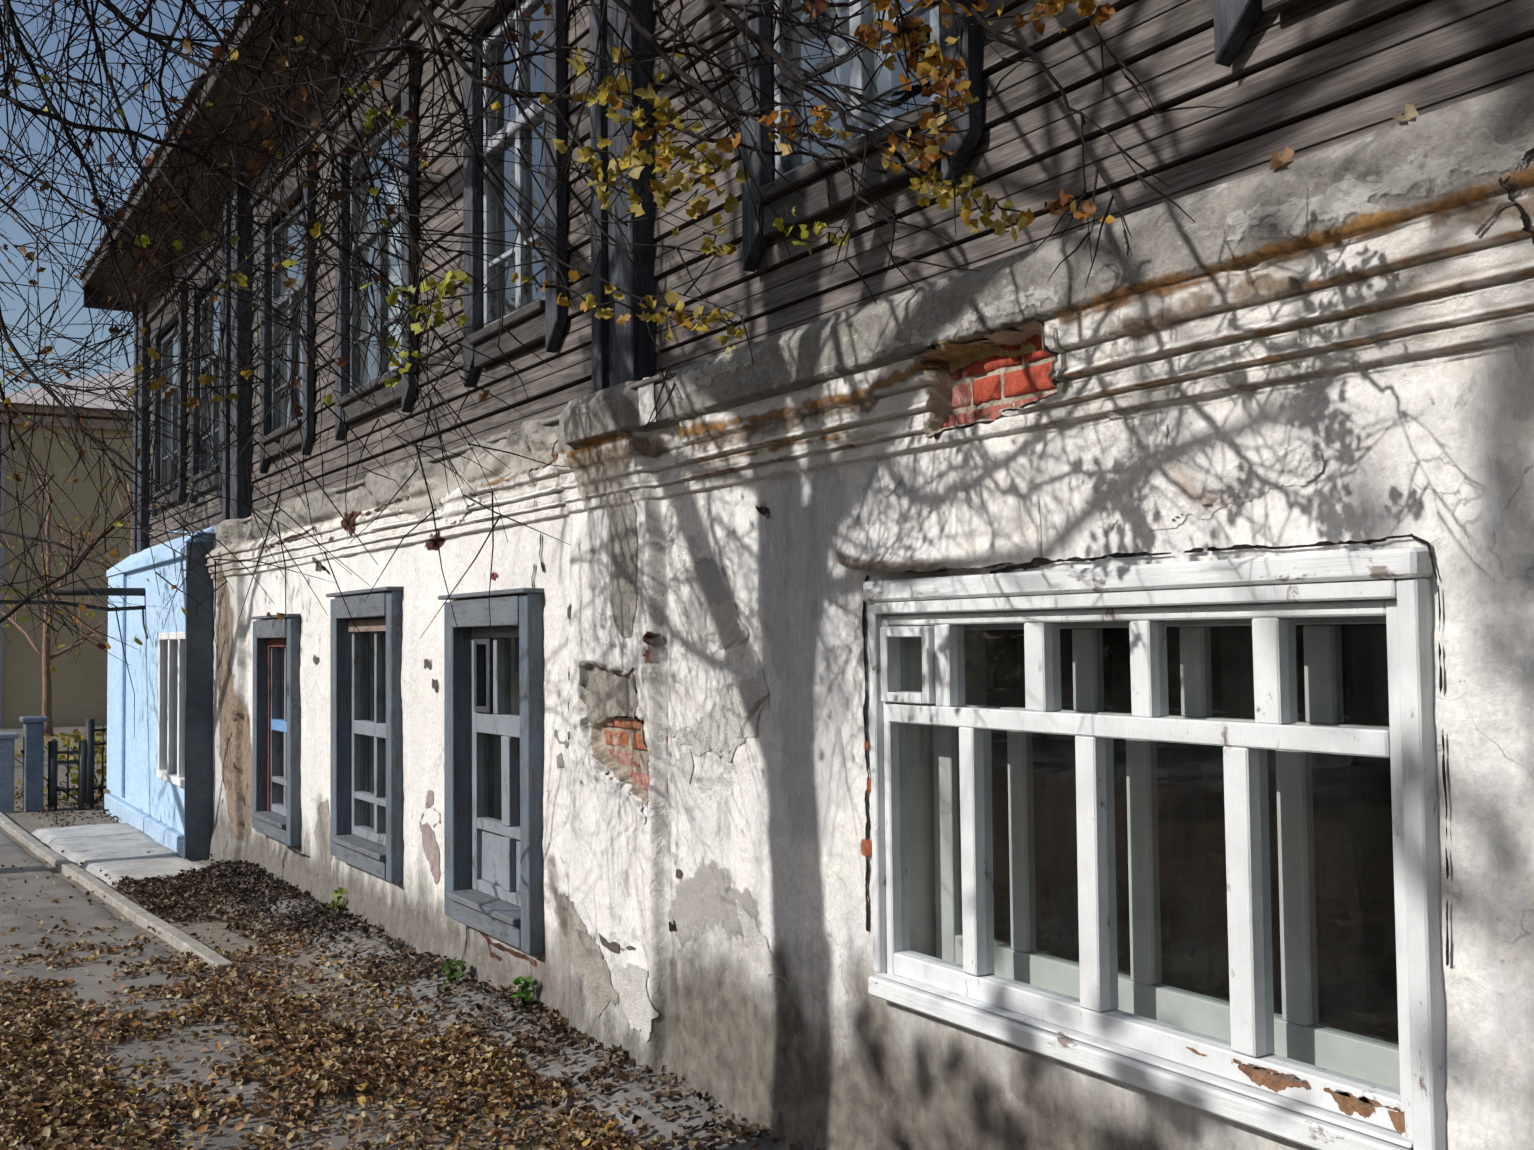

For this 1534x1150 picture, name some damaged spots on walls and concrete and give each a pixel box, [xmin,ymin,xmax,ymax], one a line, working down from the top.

crack [1475,148,1534,245]
flaking render [863,286,1068,439]
flaking render [554,489,771,825]
crack [989,533,1443,693]
flaking render [667,859,788,986]
crack [1441,730,1449,966]
damp [669,952,1183,1150]
peeling [1233,1058,1406,1133]